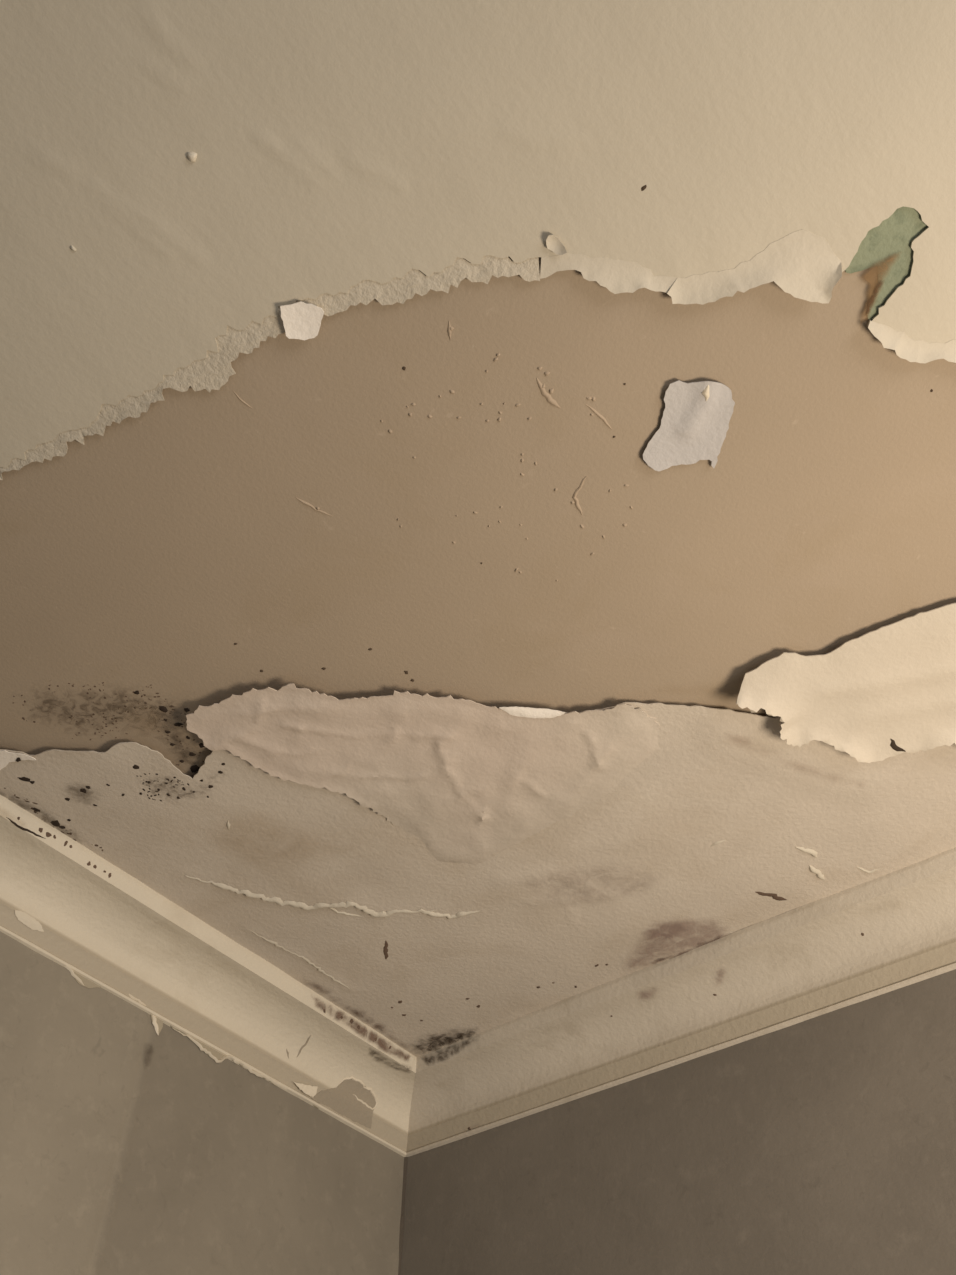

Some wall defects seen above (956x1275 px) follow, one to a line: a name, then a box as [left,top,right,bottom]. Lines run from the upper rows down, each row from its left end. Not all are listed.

peeling [0,229,956,778]
leakage [48,682,225,802]
crack [890,739,906,752]
leakage [4,788,77,848]
leakage [318,1003,469,1063]